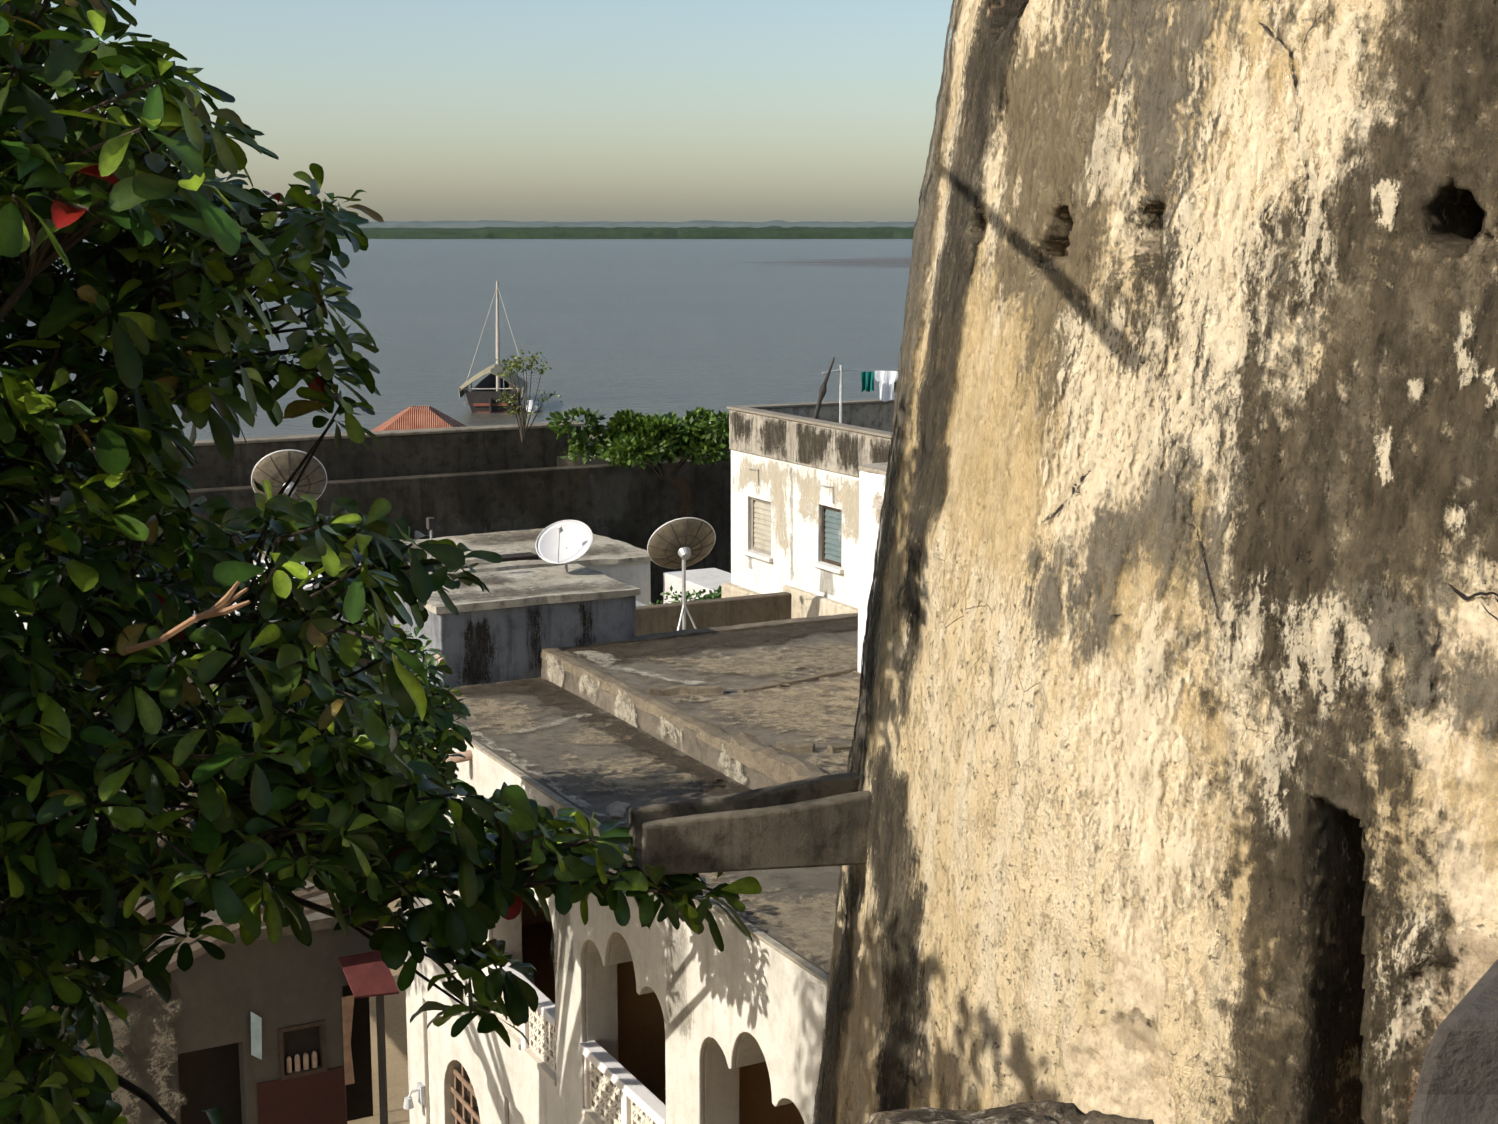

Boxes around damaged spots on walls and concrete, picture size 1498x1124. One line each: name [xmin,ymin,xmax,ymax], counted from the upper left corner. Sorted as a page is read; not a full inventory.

leakage [647,0,1498,1124]
leakage [456,617,549,734]
leakage [526,606,546,671]
leakage [574,603,597,646]
peeling [1346,611,1387,684]
crack [1421,628,1440,675]
crack [1445,583,1498,621]
leakage [559,723,706,797]
spalling [1363,588,1498,1124]